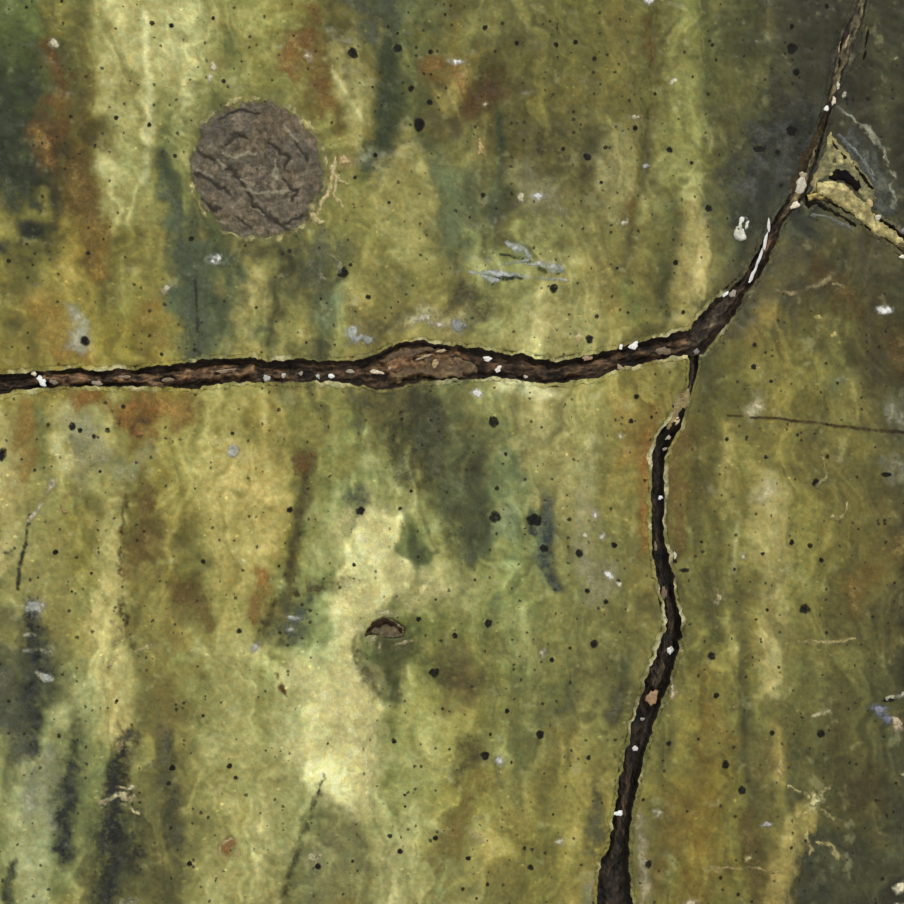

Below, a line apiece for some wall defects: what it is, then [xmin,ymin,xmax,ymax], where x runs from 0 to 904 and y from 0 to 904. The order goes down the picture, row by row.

crack [0,0,904,429]
crack [727,415,904,434]
crack [4,514,32,590]
crack [591,200,804,904]
hole [364,610,413,649]
leakage [90,729,145,904]
crack [284,850,299,896]